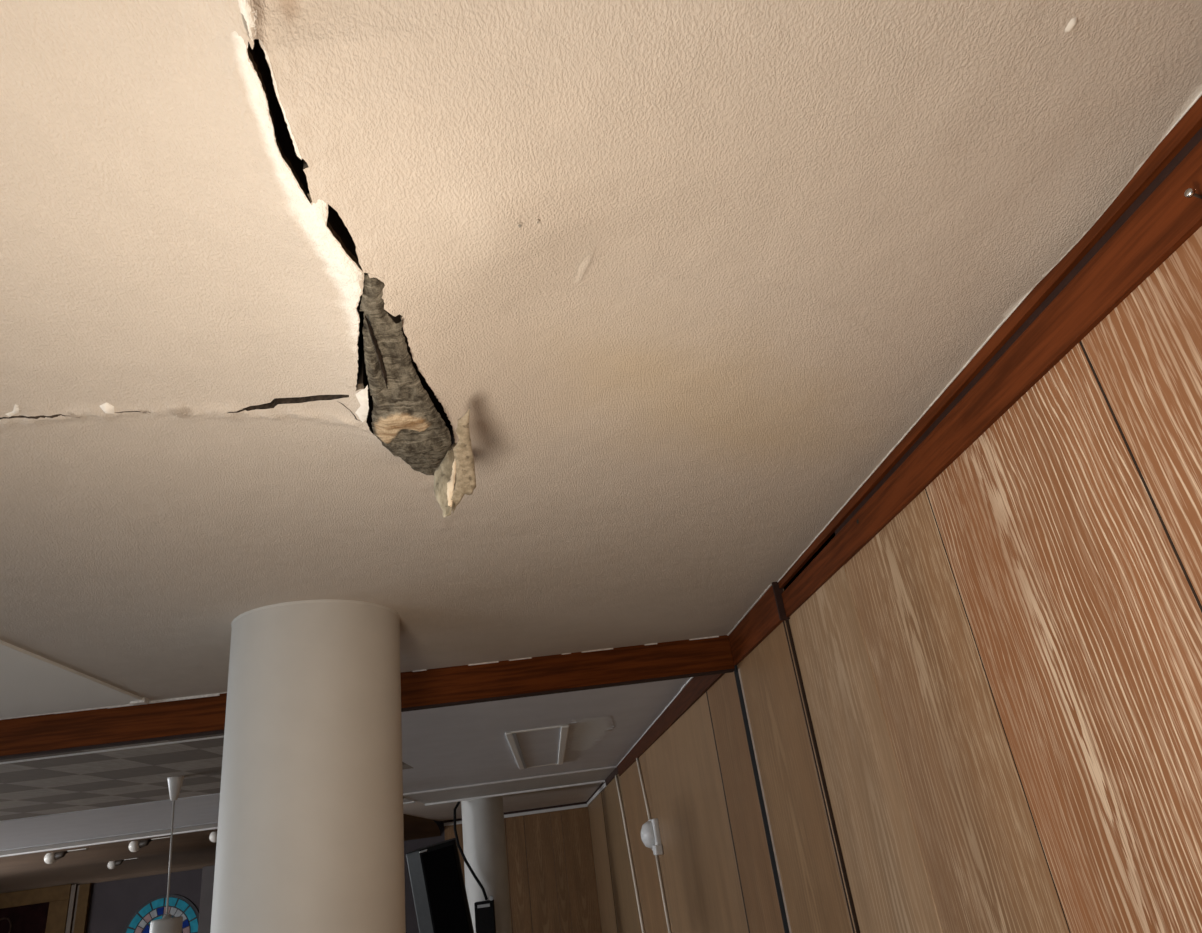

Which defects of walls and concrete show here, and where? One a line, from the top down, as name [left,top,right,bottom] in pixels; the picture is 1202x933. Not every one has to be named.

crack [222,0,363,422]
crack [0,402,197,419]
spalling [355,273,476,518]